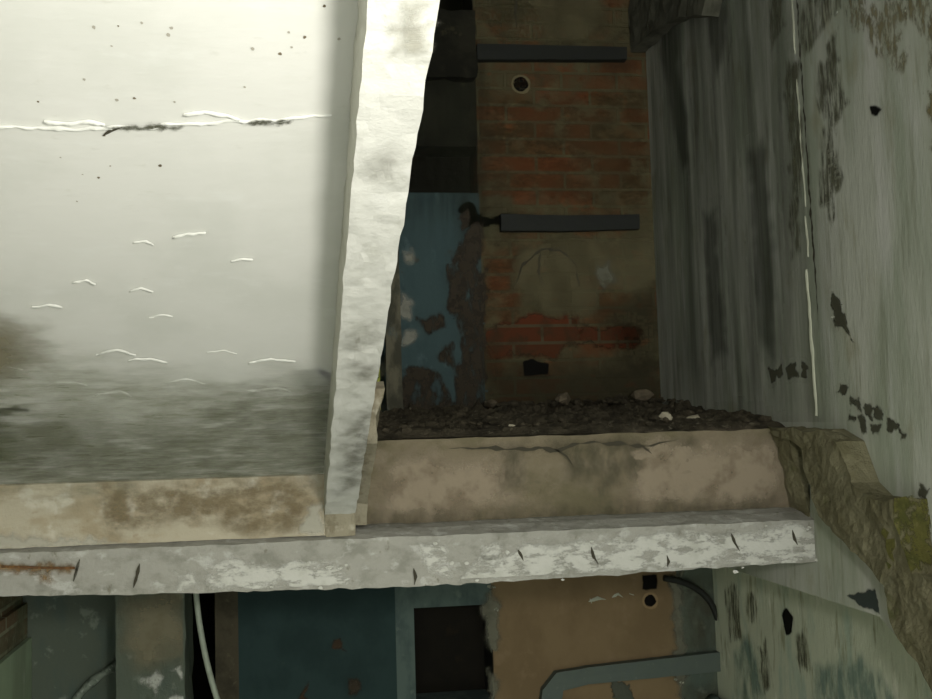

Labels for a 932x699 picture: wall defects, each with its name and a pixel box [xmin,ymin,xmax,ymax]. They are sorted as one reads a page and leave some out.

flaking render [801,0,932,71]
crack [0,110,332,136]
peeling [818,36,843,220]
peeling [400,210,489,410]
leakage [0,327,173,476]
leakage [112,387,309,476]
leakage [105,483,304,531]
corrosion [0,562,75,581]
peeling [142,672,162,691]